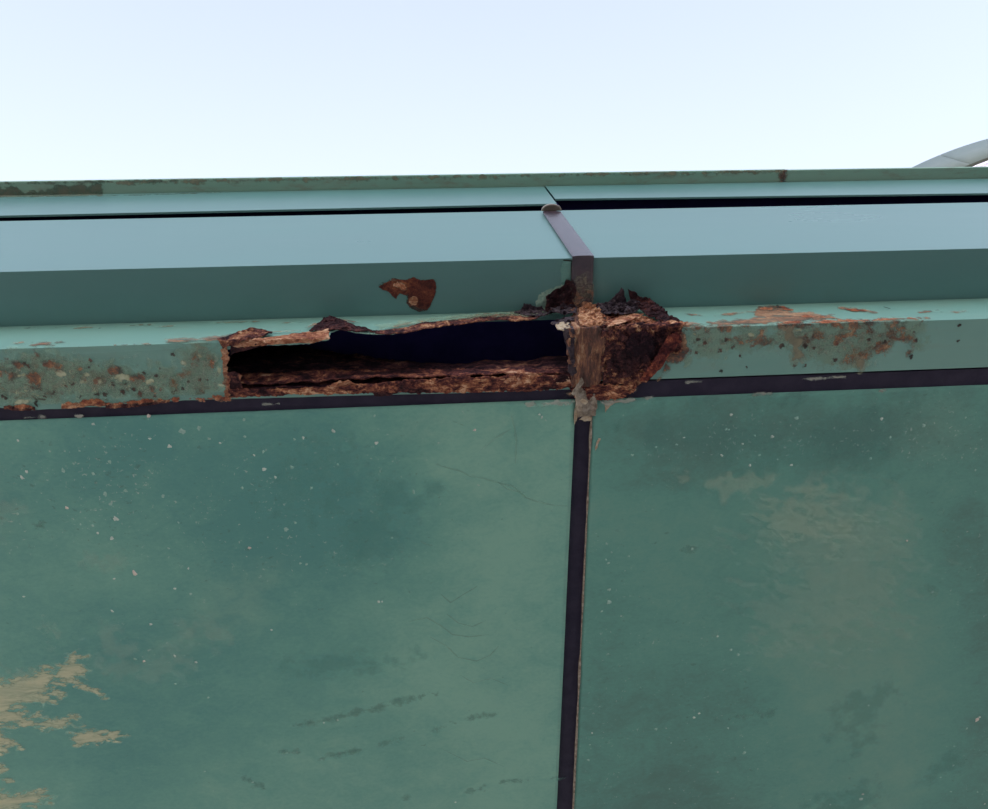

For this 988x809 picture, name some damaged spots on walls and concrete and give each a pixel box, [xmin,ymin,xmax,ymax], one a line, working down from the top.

corrosion [61,276,651,424]
corrosion [684,305,932,370]